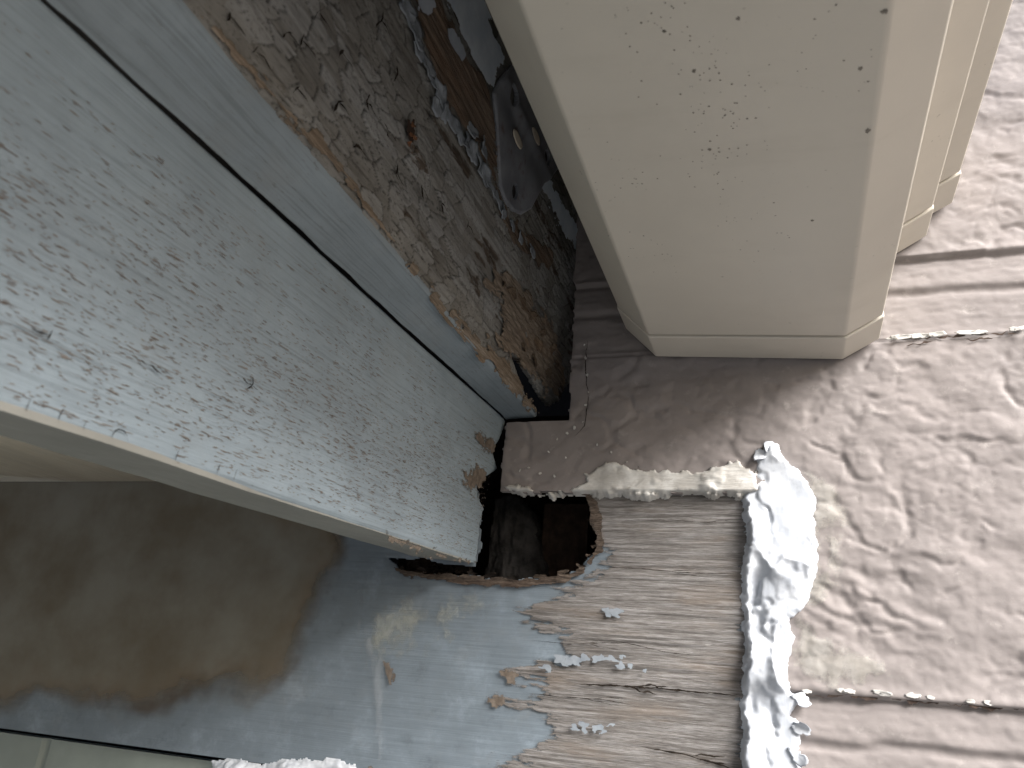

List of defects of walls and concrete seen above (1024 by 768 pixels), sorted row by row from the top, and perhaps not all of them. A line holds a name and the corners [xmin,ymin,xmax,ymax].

peeling [399,0,554,270]
damp [0,481,341,705]
peeling [462,463,487,492]
peeling [487,494,747,768]